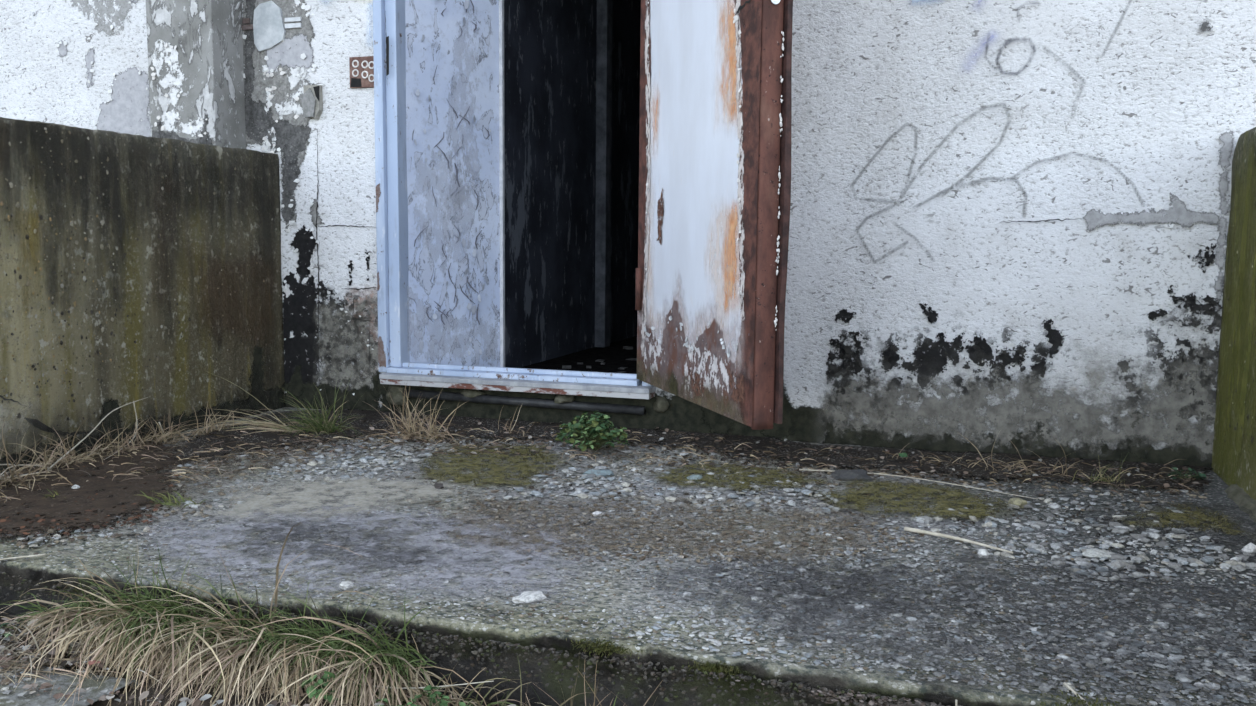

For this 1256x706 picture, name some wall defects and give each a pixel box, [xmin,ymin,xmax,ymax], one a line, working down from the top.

spalling [55,40,67,57]
spalling [85,46,95,88]
peeling [72,0,138,36]
peeling [92,39,208,137]
damp [3,0,311,268]
rust [722,10,740,115]
spalling [242,0,386,395]
rust [638,207,745,404]
damp [0,282,1223,474]
damp [1089,501,1256,543]